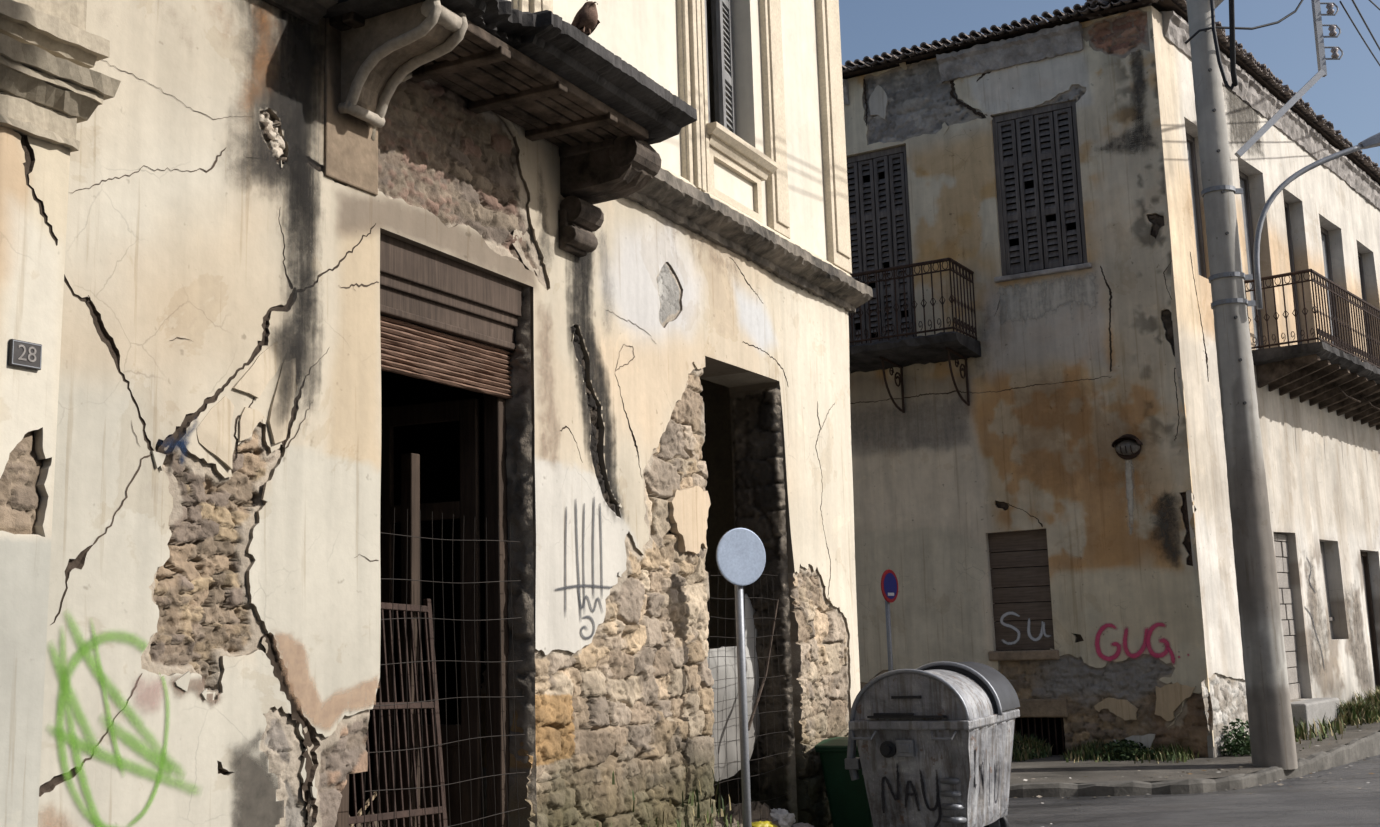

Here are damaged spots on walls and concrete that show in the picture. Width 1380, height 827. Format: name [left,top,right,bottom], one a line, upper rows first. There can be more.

damp [252,9,321,419]
spalling [371,72,548,290]
damp [1106,50,1153,150]
spalling [0,430,44,534]
crack [15,60,379,625]
spalling [141,423,377,827]
damp [568,252,622,513]
spalling [508,362,717,827]
crack [605,310,655,477]
spalling [998,634,1249,758]
damp [1125,459,1133,534]
damp [1154,494,1180,562]